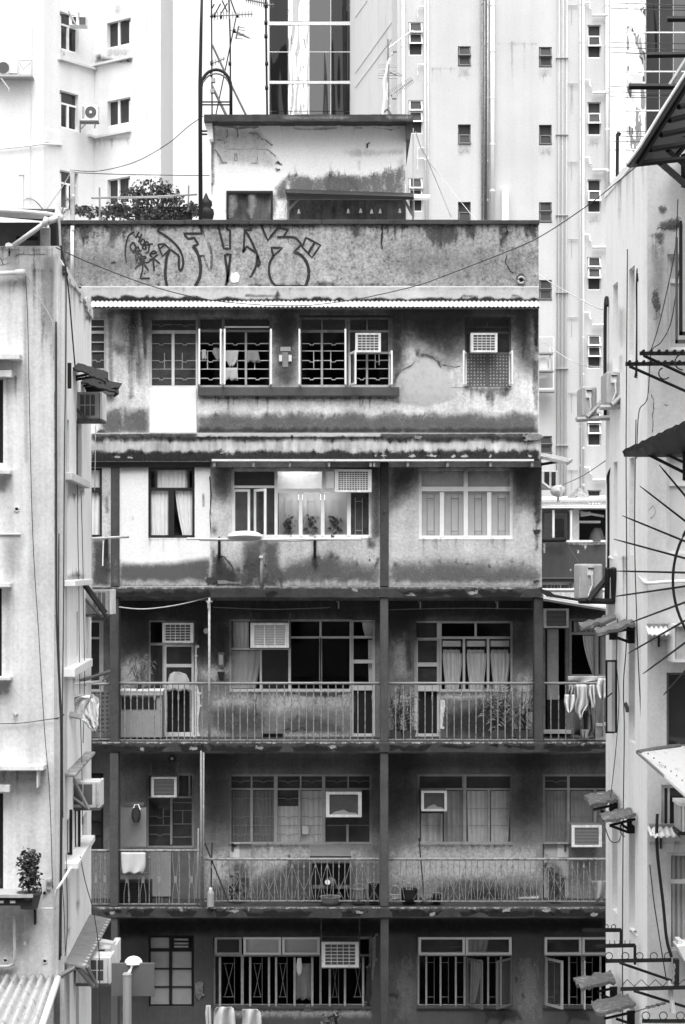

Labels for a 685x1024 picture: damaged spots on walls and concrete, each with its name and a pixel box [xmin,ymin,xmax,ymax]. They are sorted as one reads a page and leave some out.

damp [270,167,405,210]
damp [337,225,475,246]
damp [499,225,536,246]
crack [403,354,469,388]
damp [91,396,539,461]
damp [390,560,540,594]